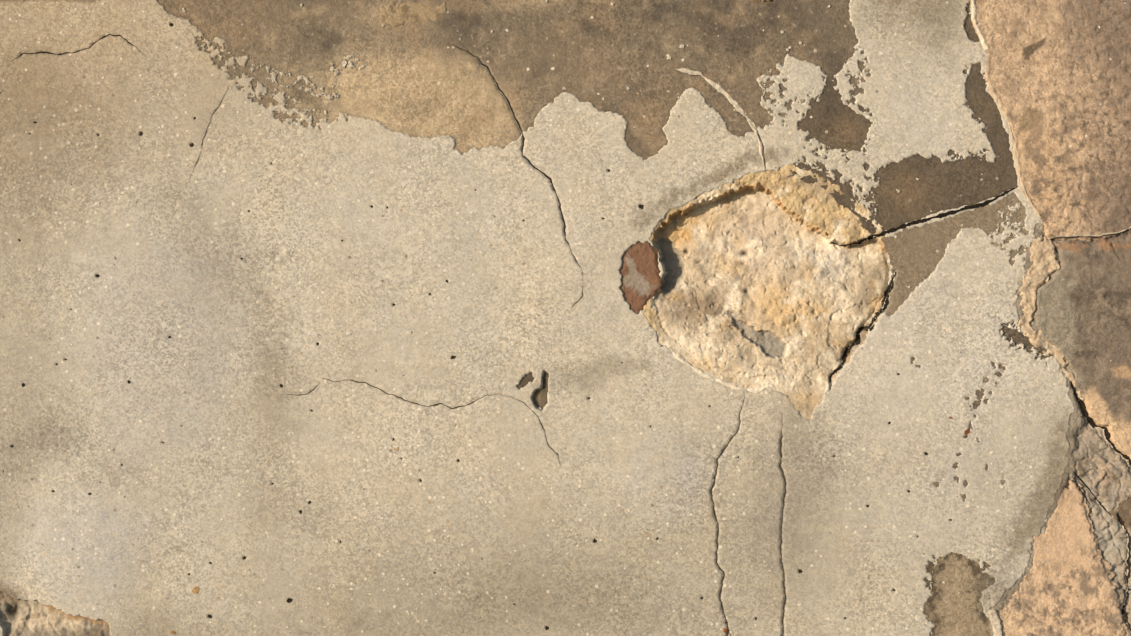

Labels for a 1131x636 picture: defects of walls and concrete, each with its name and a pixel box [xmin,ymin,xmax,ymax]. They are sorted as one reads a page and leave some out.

crack [11,34,139,62]
crack [452,44,583,308]
peeling [158,0,1059,420]
crack [831,186,1018,246]
spalling [0,592,111,636]
crack [288,378,561,468]
crack [711,395,745,636]
crack [778,421,786,636]
crack [830,271,896,389]
spalling [923,281,1131,636]